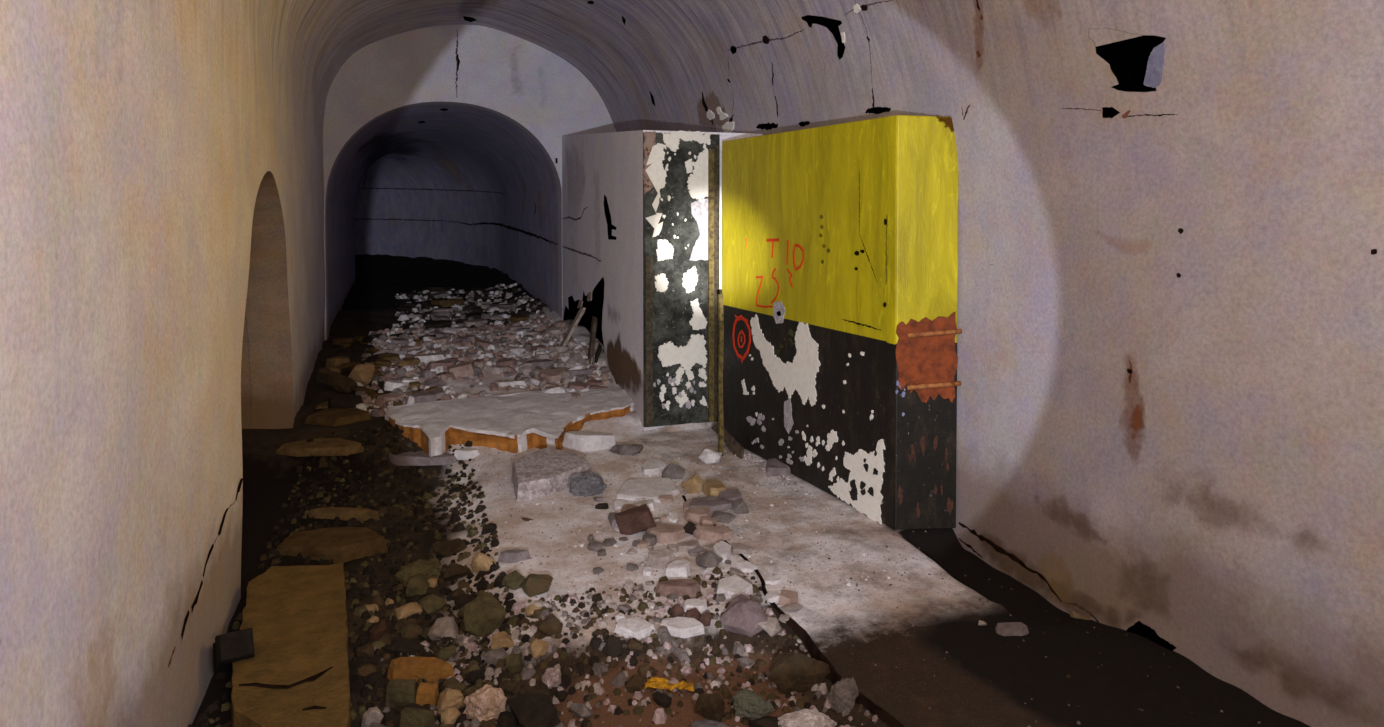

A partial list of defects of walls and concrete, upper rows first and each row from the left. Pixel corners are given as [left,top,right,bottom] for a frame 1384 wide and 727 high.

crack [453,29,461,97]
spalling [801,15,845,58]
spalling [1091,28,1166,92]
spalling [1102,107,1131,118]
rust [1131,406,1144,430]
crack [168,478,243,668]
crack [959,522,1099,622]
crack [713,524,905,727]